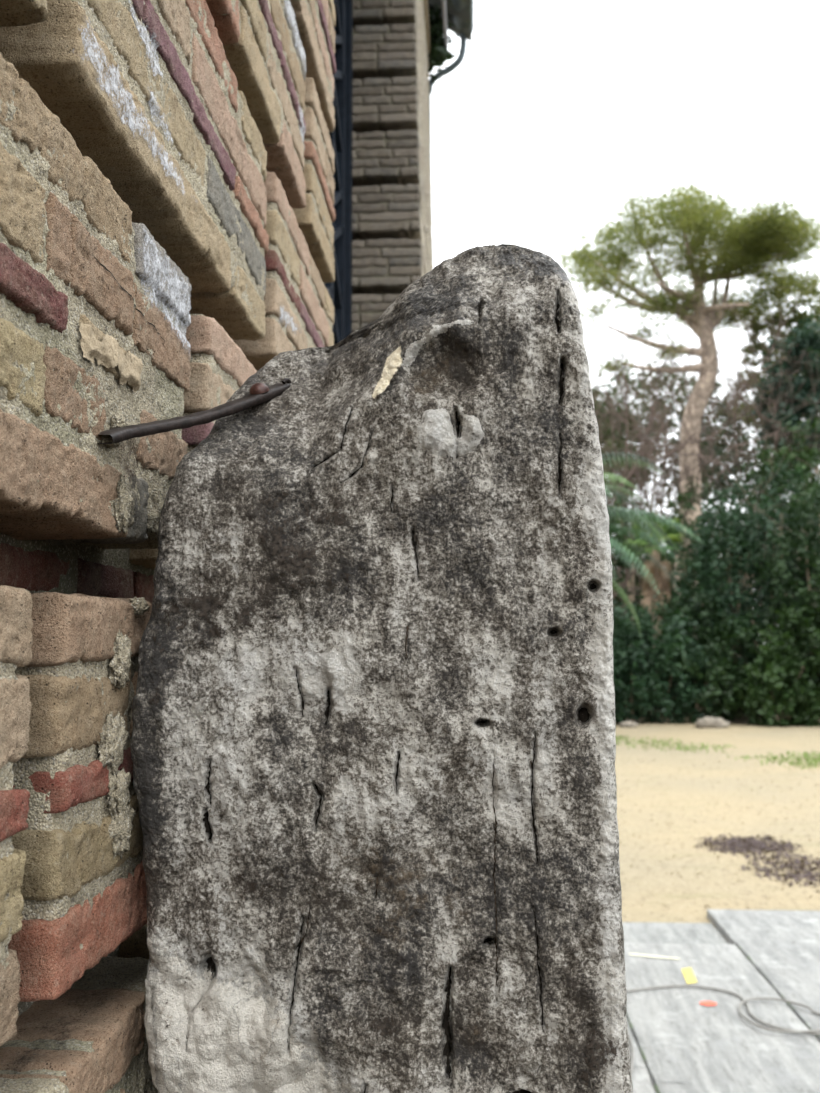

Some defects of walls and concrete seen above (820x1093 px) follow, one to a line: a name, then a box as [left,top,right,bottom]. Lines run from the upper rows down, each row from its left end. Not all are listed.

peeling [372,346,402,399]
crack [558,363,566,404]
crack [556,437,564,497]
crack [442,966,452,1078]